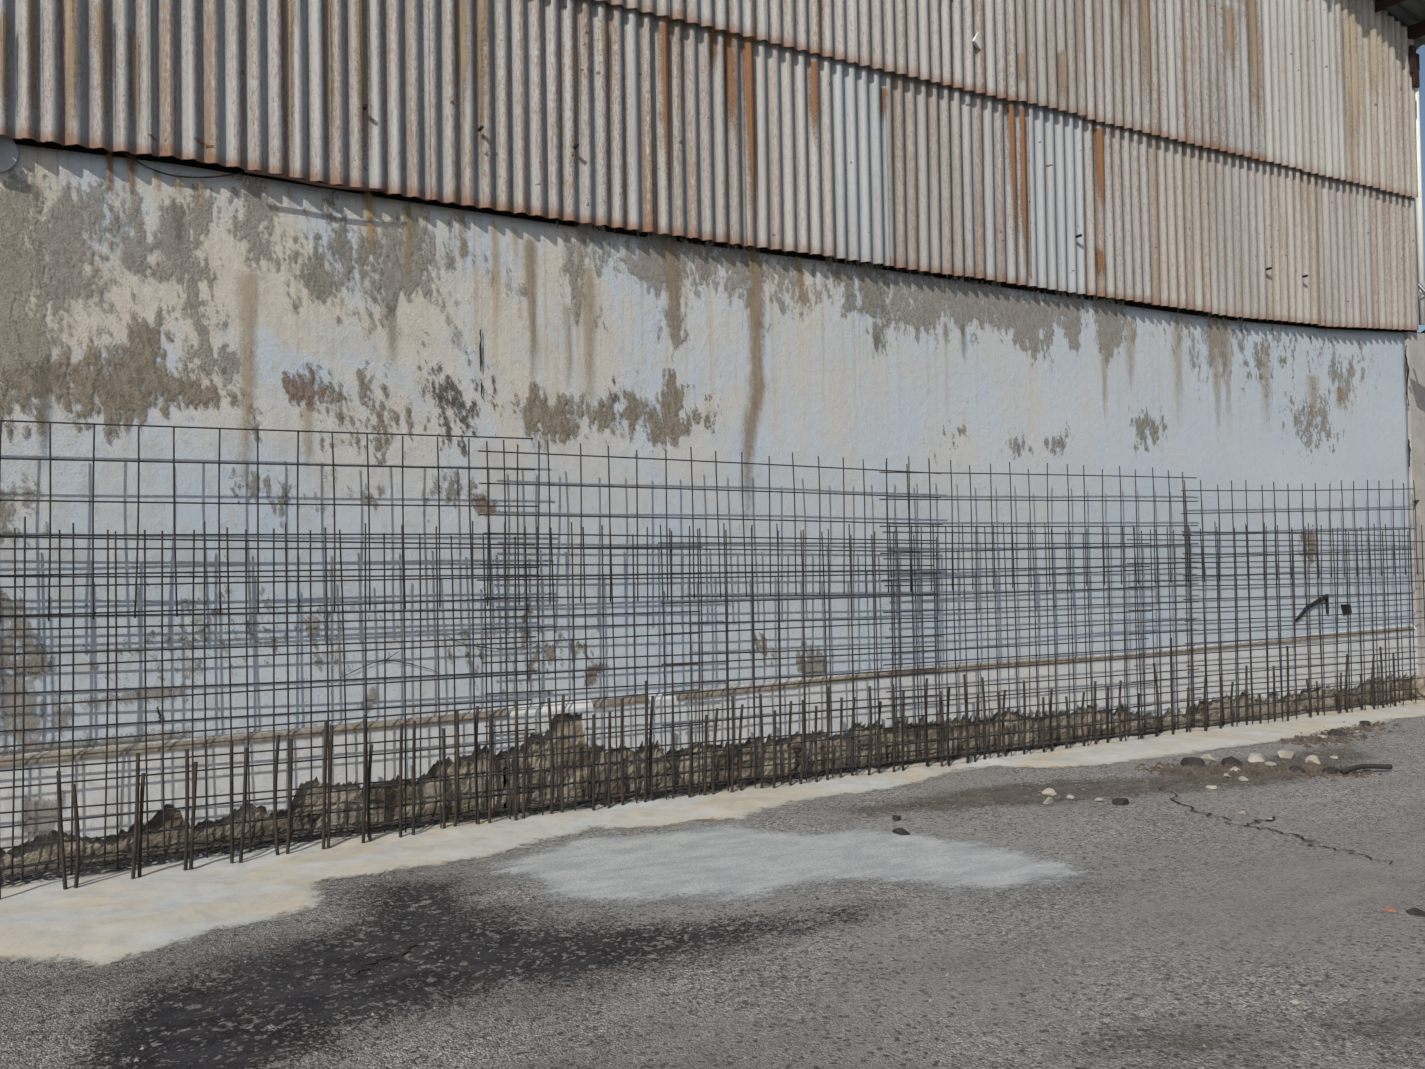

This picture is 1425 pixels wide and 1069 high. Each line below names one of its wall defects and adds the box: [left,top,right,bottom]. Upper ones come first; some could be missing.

corrosion [26,0,36,107]
corrosion [62,0,77,115]
corrosion [94,1,110,131]
corrosion [281,0,295,142]
corrosion [323,0,333,142]
corrosion [354,0,371,164]
corrosion [571,9,581,174]
corrosion [601,20,609,82]
corrosion [657,15,672,207]
corrosion [709,26,756,199]
corrosion [1006,103,1027,246]
peeling [0,168,1425,881]